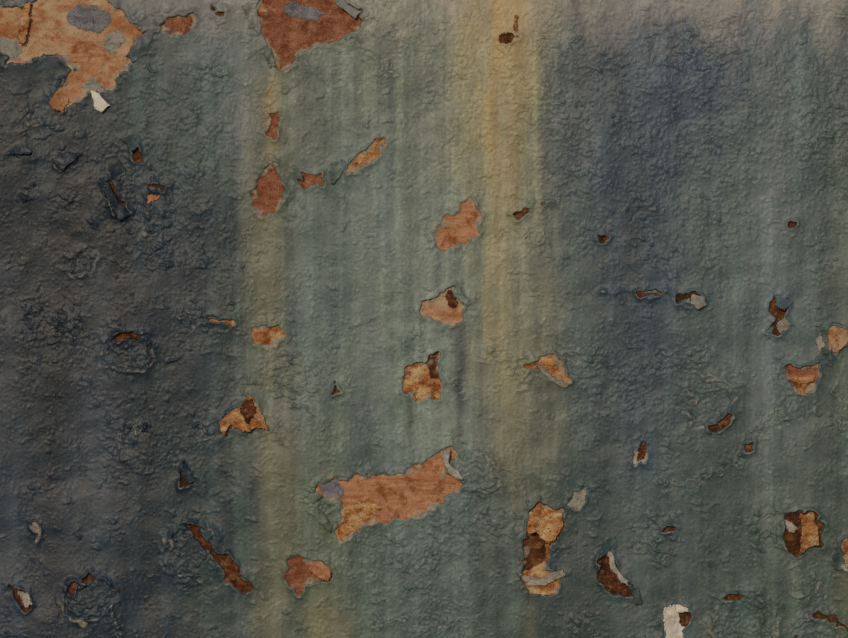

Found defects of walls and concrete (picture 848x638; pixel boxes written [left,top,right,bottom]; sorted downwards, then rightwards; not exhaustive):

peeling [0,0,232,121]
peeling [242,0,376,84]
peeling [243,106,391,224]
peeling [419,190,489,258]
peeling [212,391,270,436]
peeling [394,347,447,407]
peeling [778,321,848,404]
peeling [302,438,473,551]
peeling [514,482,592,603]
peeling [592,537,648,605]
peeling [775,503,848,575]
peeling [657,596,696,638]